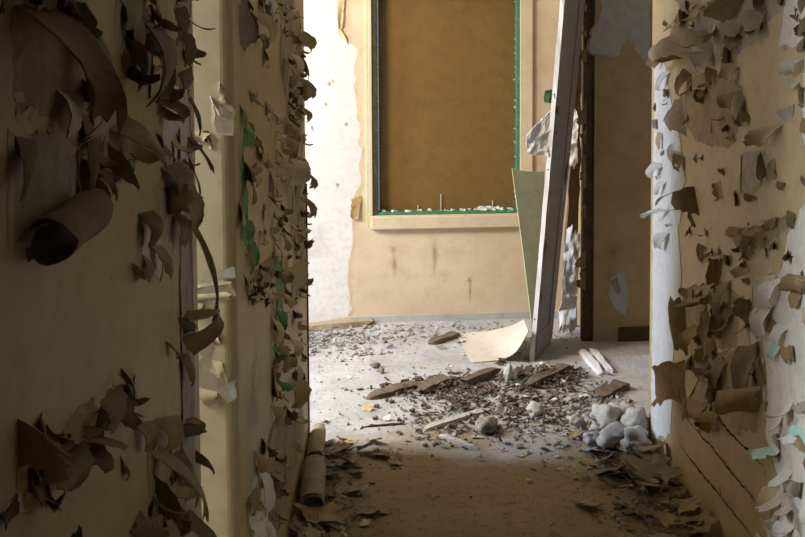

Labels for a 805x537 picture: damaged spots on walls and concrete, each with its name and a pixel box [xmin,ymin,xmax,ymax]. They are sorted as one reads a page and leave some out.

peeling [0,0,366,537]
peeling [574,249,586,290]
peeling [576,100,587,144]
peeling [579,0,805,537]